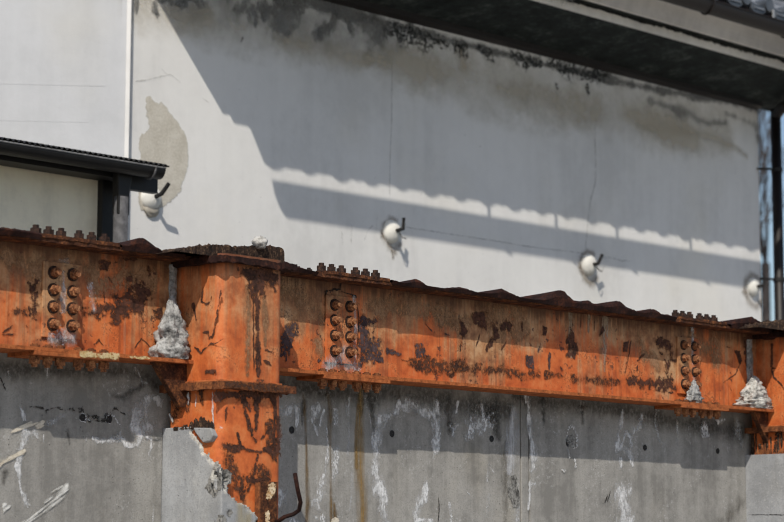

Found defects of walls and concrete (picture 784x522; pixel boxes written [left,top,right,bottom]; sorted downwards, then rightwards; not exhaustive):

damp [153,0,202,16]
damp [234,0,784,125]
peeling [139,96,189,208]
corrosion [8,278,42,326]
corrosion [82,265,163,326]
corrosion [191,289,222,354]
corrosion [213,267,299,504]
corrosion [358,311,676,394]
corrosion [723,335,753,391]
spalling [204,469,232,497]
corrosion [355,389,365,522]
damp [279,379,743,522]